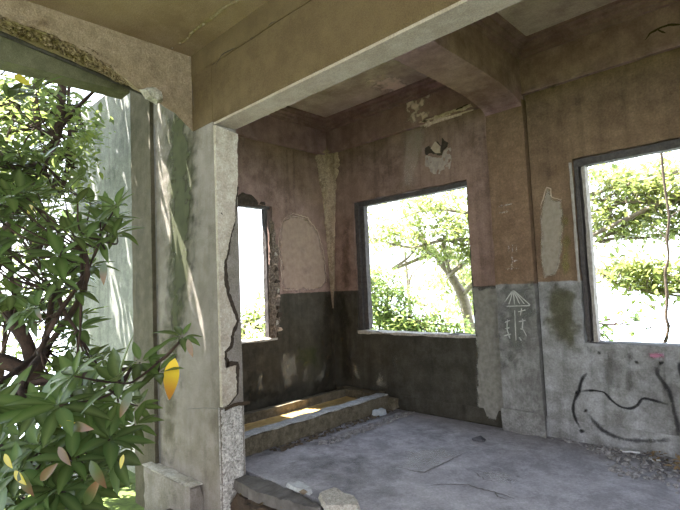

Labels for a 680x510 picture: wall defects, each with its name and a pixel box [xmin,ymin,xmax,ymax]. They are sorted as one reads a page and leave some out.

spalling [0,11,163,105]
flaking render [425,138,452,174]
spalling [419,104,474,127]
peeling [268,213,327,338]
peeling [540,187,563,276]
peeling [471,287,504,420]